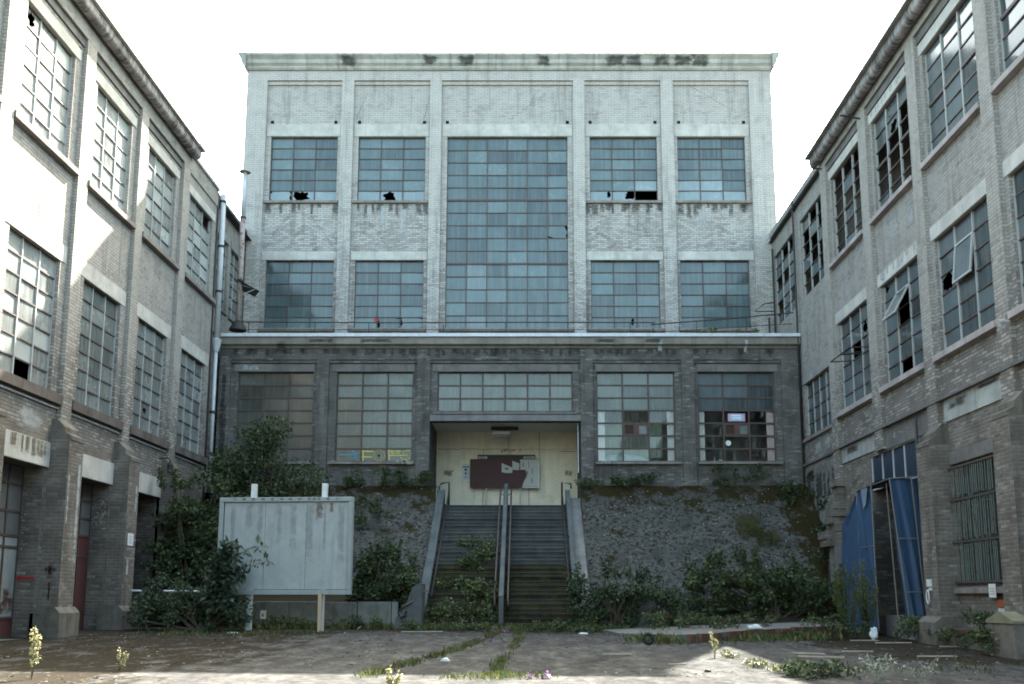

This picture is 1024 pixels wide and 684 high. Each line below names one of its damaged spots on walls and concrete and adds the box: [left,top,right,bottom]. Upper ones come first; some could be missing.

damp [608,55,641,66]
damp [655,55,707,66]